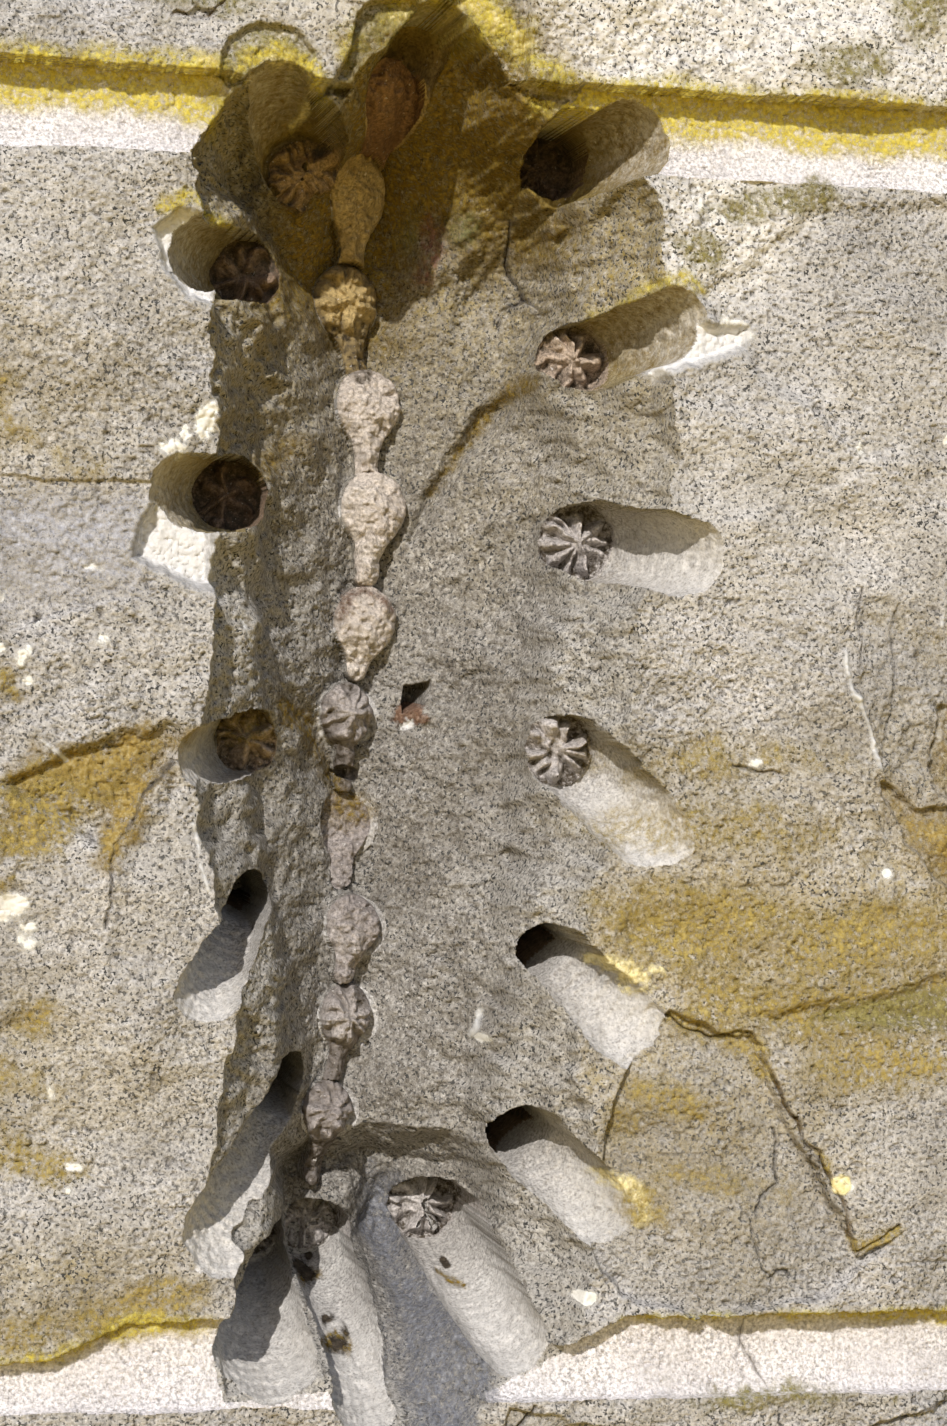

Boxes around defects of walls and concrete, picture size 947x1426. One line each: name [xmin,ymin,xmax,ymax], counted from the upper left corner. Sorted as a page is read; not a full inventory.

water stain [0,643,34,700]
water stain [0,743,94,798]
crack [130,761,173,824]
water stain [0,875,41,951]
water stain [0,1138,83,1194]
crack [750,1033,899,1239]
water stain [79,1278,202,1339]